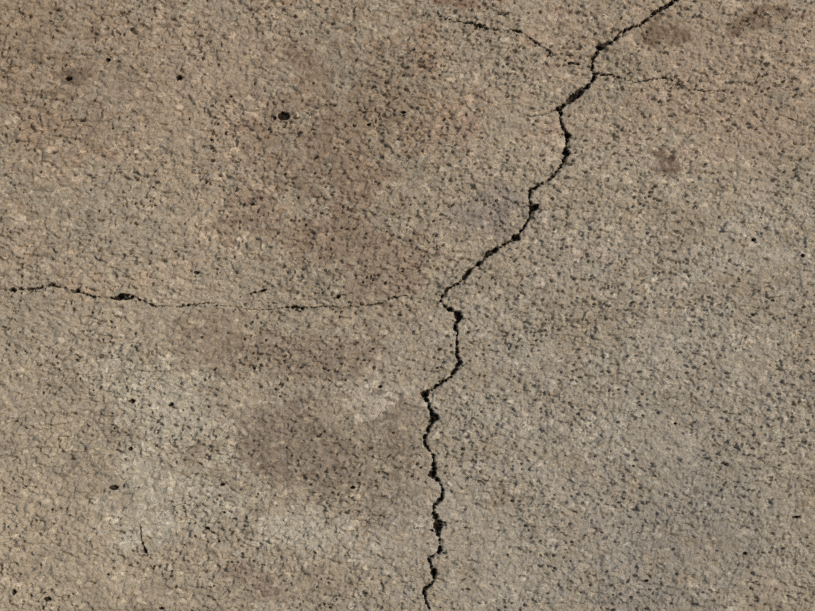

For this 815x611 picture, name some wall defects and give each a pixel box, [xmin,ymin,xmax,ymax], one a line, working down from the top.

crack [9,283,101,299]
crack [109,0,724,609]